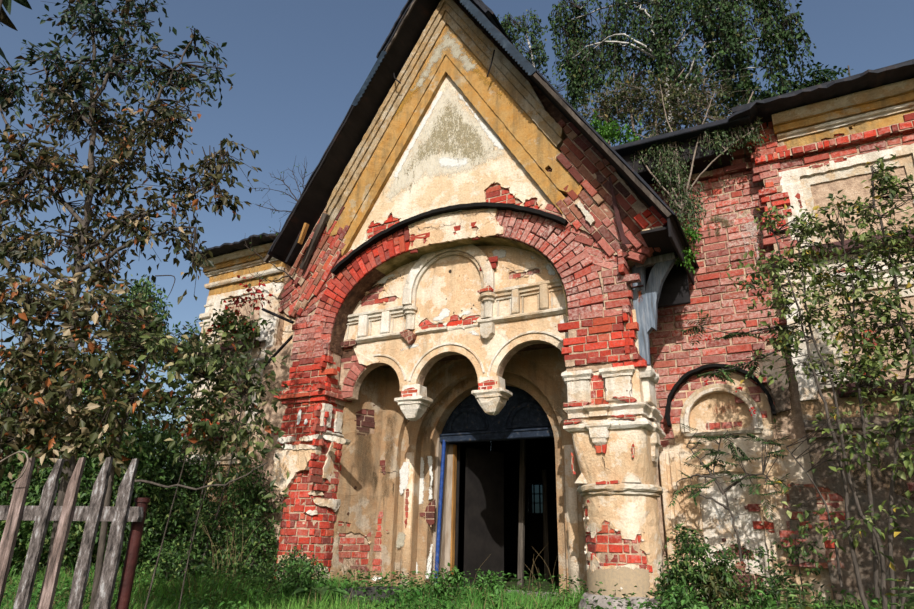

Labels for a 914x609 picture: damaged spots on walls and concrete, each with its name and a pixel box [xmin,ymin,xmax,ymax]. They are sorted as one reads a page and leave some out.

leakage [387,84,504,200]
flaking render [485,181,542,209]
flaking render [365,211,403,241]
flaking render [400,304,481,345]
flaking render [419,500,435,527]
flaking render [582,500,653,573]
flaking render [744,482,846,569]